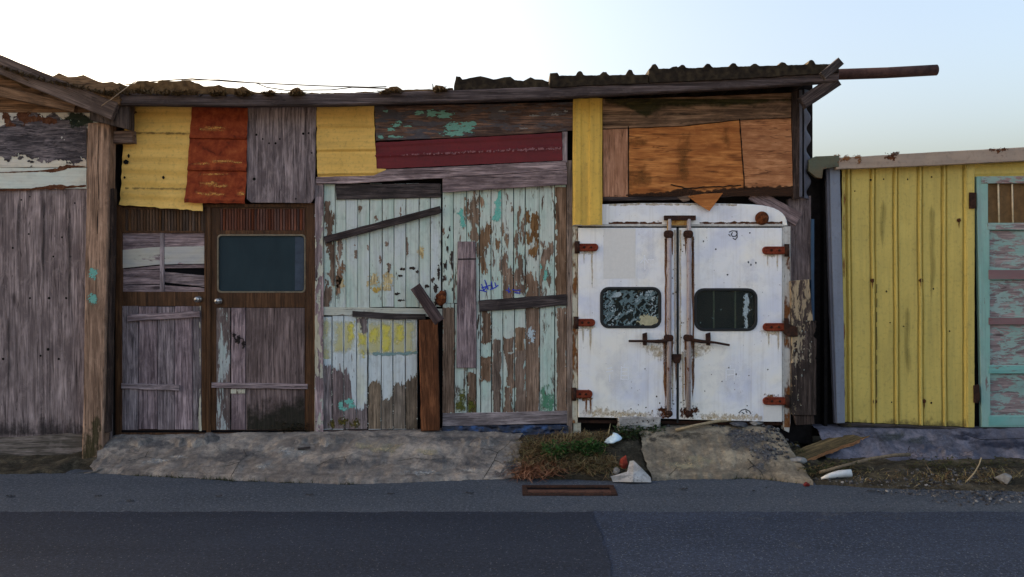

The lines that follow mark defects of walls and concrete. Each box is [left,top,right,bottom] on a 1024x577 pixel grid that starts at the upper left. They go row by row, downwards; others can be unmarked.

peeling [0,112,87,167]
peeling [378,109,477,140]
damp [247,399,304,430]
peeling [314,180,425,432]
peeling [425,187,566,413]
rust [572,326,592,379]
rust [577,230,758,430]
peeling [791,321,816,415]